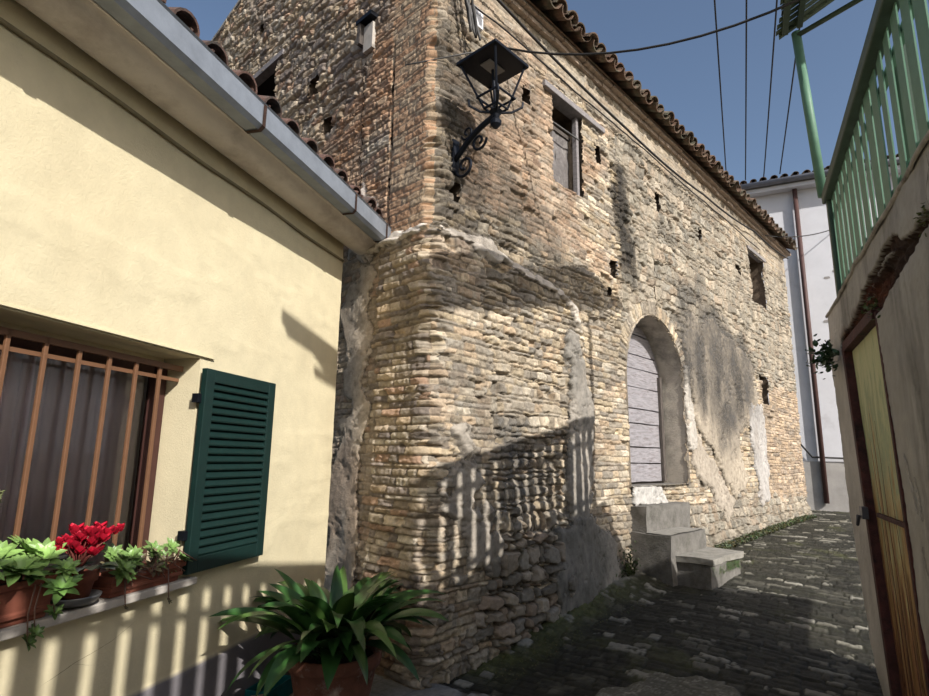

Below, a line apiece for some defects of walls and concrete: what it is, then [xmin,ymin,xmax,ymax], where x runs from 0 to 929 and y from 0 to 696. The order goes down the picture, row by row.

peeling [324,223,428,592]
spalling [437,224,627,651]
damp [608,165,637,285]
peeling [683,313,771,523]